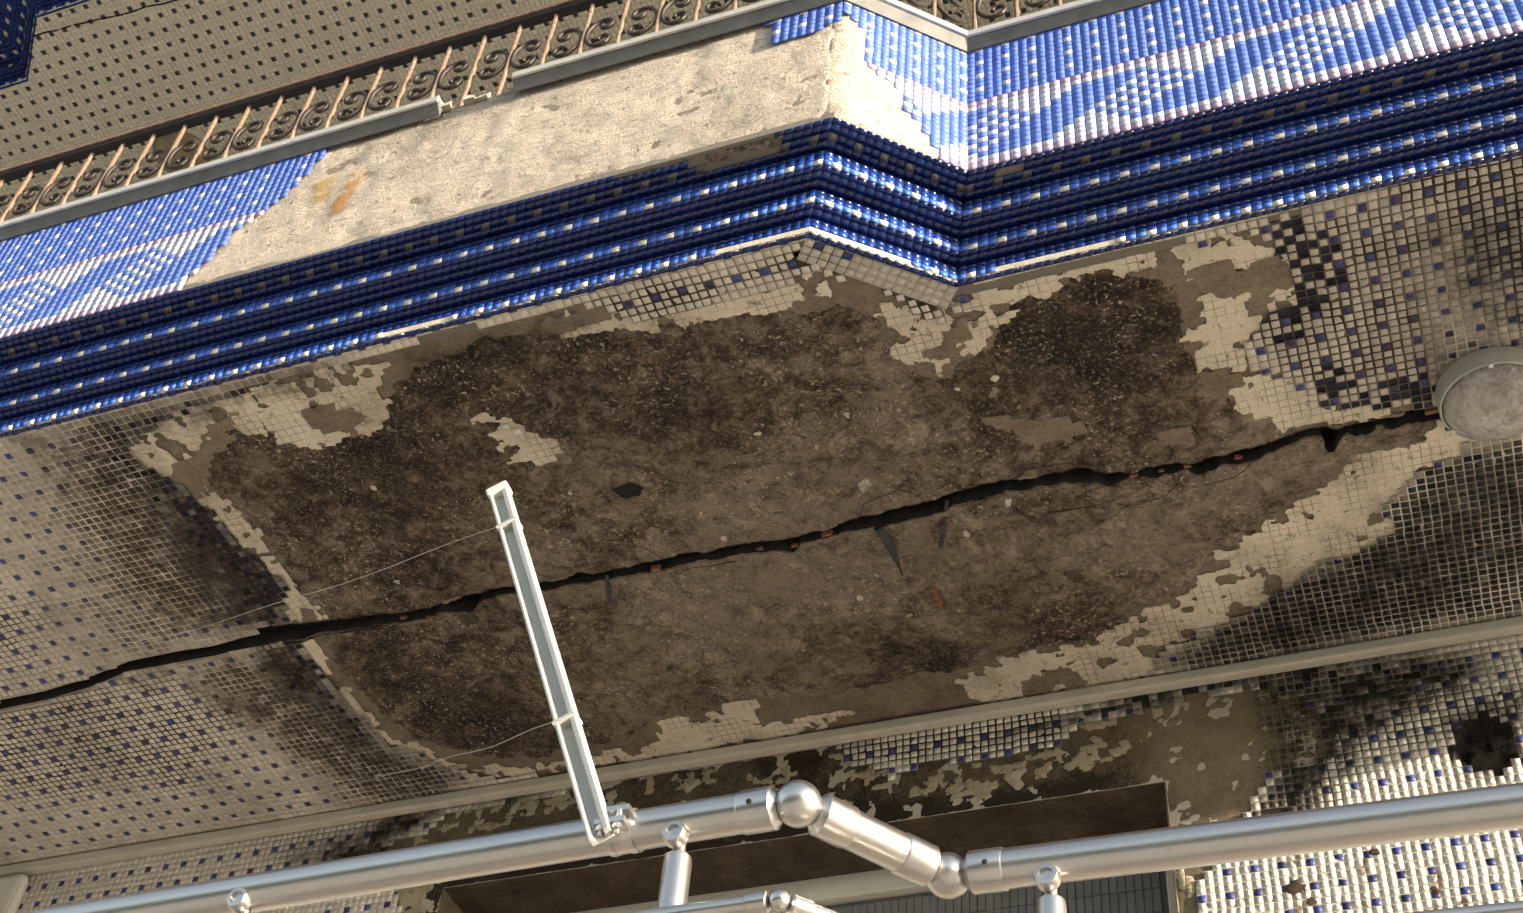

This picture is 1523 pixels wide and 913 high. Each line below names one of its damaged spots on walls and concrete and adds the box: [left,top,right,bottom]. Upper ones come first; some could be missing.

flaking render [183,11,940,286]
crack [0,406,1440,714]
spalling [102,209,1483,858]
leakage [1189,465,1523,662]
leakage [1253,656,1464,803]
leakage [1444,689,1523,776]
flaking render [394,823,885,913]
flaking render [1172,865,1213,913]